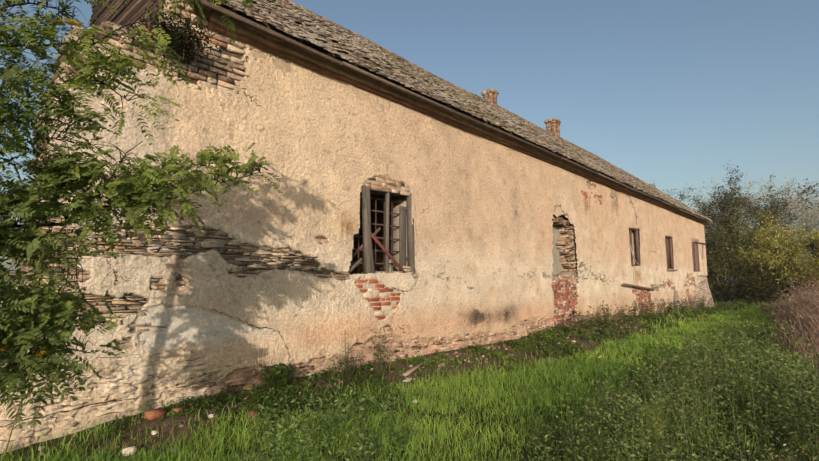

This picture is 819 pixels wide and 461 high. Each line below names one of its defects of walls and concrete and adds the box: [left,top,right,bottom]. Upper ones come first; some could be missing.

spalling [80,25,292,94]
spalling [361,173,412,196]
spalling [631,273,713,314]
spalling [0,213,623,447]